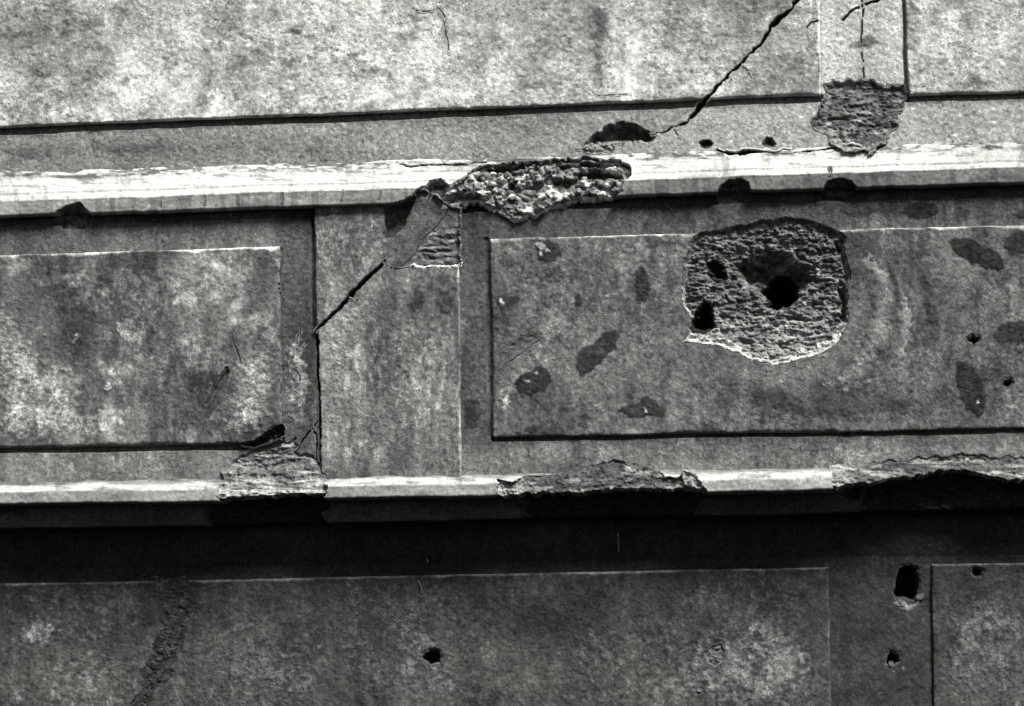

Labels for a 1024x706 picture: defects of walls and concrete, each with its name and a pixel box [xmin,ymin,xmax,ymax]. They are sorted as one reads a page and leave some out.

crack [650,0,882,140]
crack [588,91,632,99]
flaking render [810,78,911,157]
spalling [381,121,655,269]
spalling [706,261,728,283]
spalling [690,300,715,334]
flaking render [217,341,328,501]
spalling [498,460,707,508]
spalling [829,453,1024,500]